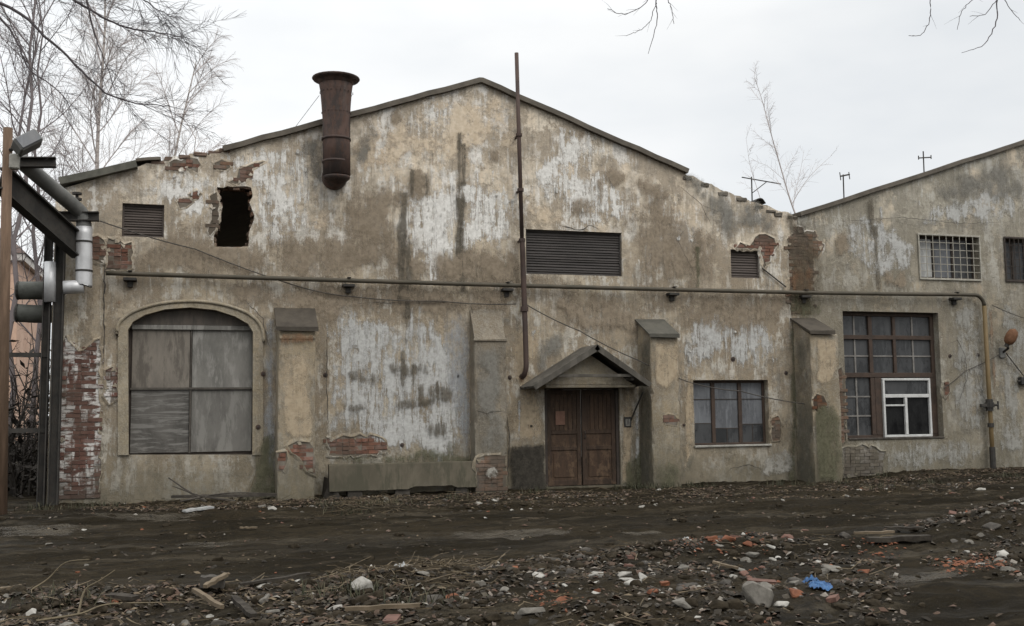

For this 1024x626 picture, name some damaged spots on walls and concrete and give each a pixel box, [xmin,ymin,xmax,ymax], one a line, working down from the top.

flaking render [92,233,137,272]
peeling [153,147,326,247]
damp [135,133,546,322]
flaking render [733,225,825,317]
flaking render [59,334,118,501]
peeling [276,307,464,478]
flaking render [472,452,508,492]
flaking render [811,340,887,478]